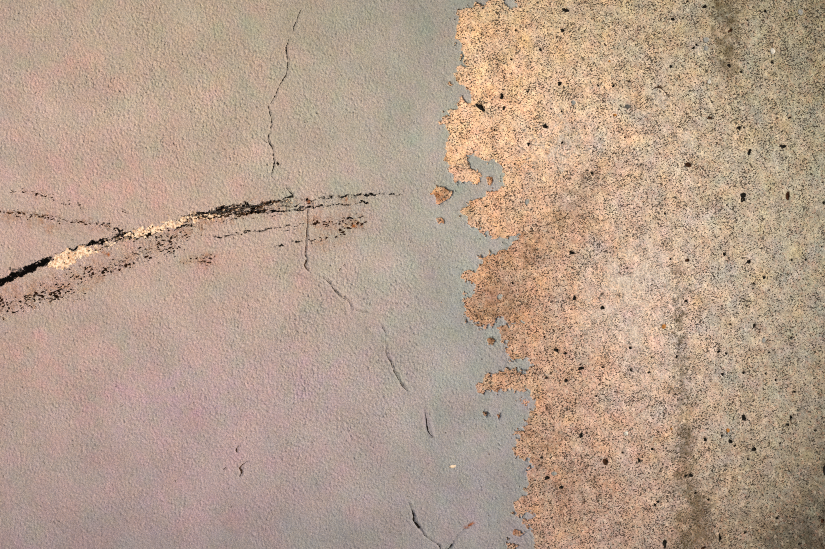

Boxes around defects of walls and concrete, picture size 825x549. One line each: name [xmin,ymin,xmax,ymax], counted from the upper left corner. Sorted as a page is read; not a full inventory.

crack [265,10,301,177]
crack [0,188,126,229]
crack [287,189,357,311]
peeling [430,0,825,549]